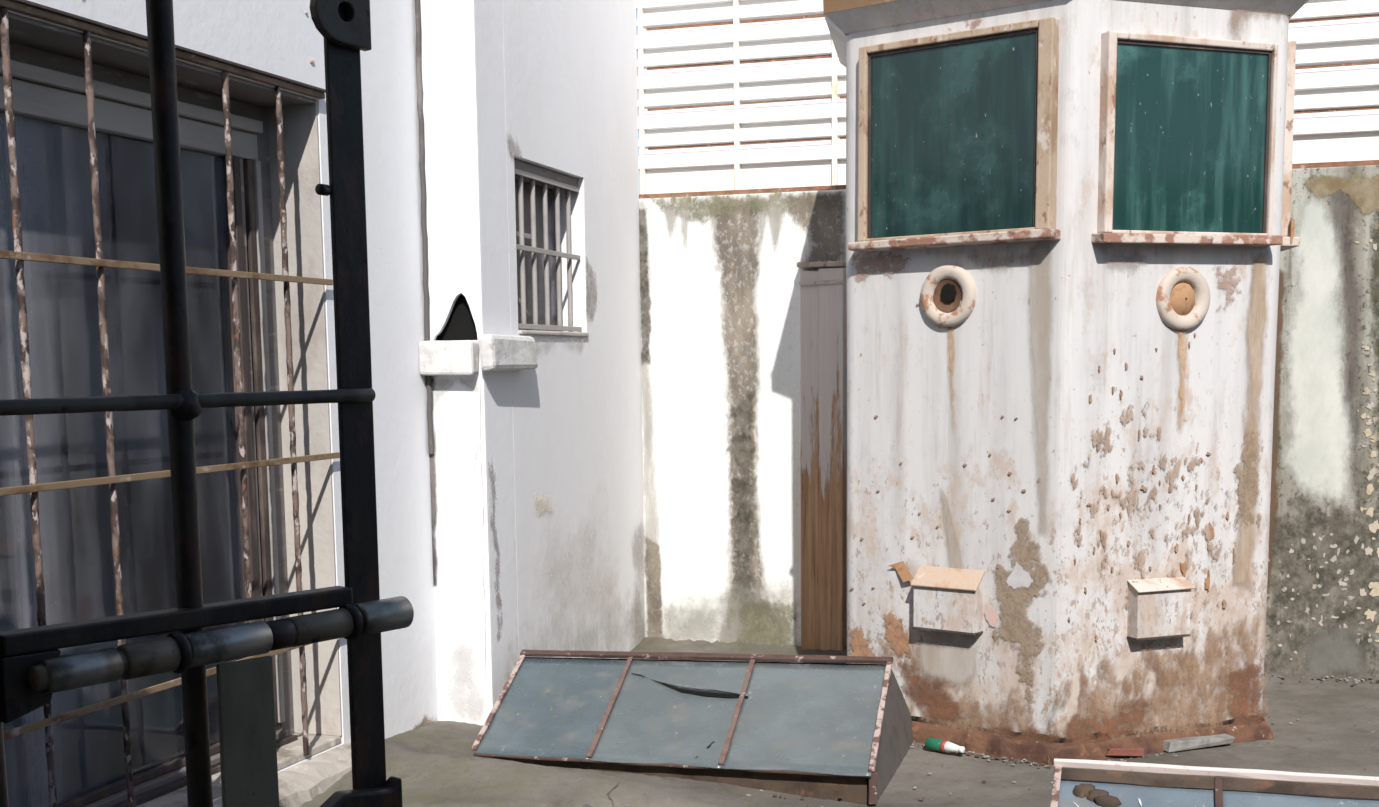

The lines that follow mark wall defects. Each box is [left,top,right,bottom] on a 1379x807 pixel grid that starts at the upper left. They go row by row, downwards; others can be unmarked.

water stain [639,200,796,646]
rust [1178,330,1187,426]
water stain [1264,174,1379,678]
peeling [985,497,1052,713]
rust [883,620,1267,745]